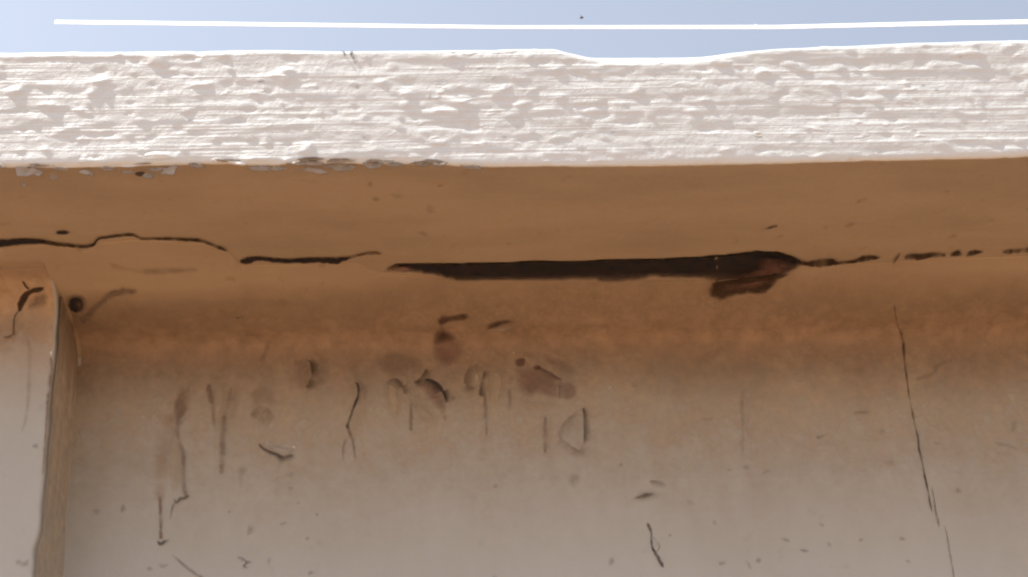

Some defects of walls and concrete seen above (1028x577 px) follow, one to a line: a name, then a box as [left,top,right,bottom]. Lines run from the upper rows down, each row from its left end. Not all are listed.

peeling [0,157,447,188]
crack [0,234,1028,299]
leakage [0,269,1028,577]
crack [894,307,948,541]